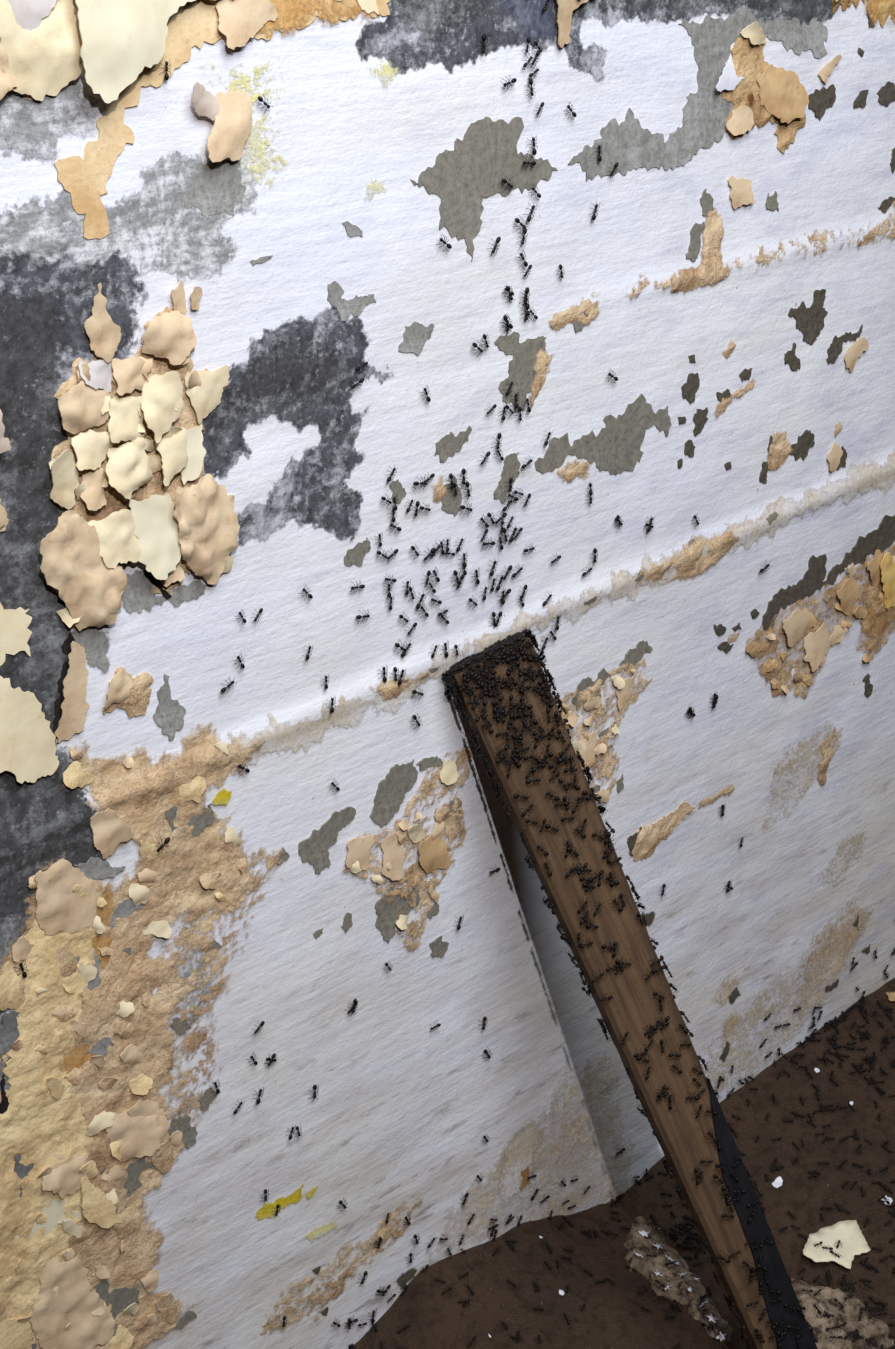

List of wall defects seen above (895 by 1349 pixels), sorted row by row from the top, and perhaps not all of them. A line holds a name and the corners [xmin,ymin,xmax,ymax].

peeling [0,0,390,239]
water stain [392,0,557,45]
peeling [410,0,842,262]
water stain [599,0,824,17]
peeling [853,81,895,108]
peeling [671,175,779,293]
water stain [0,242,148,392]
water stain [203,340,346,453]
peeling [759,430,815,483]
peeling [713,515,895,699]
peeling [557,640,653,803]
peeling [0,280,474,1349]